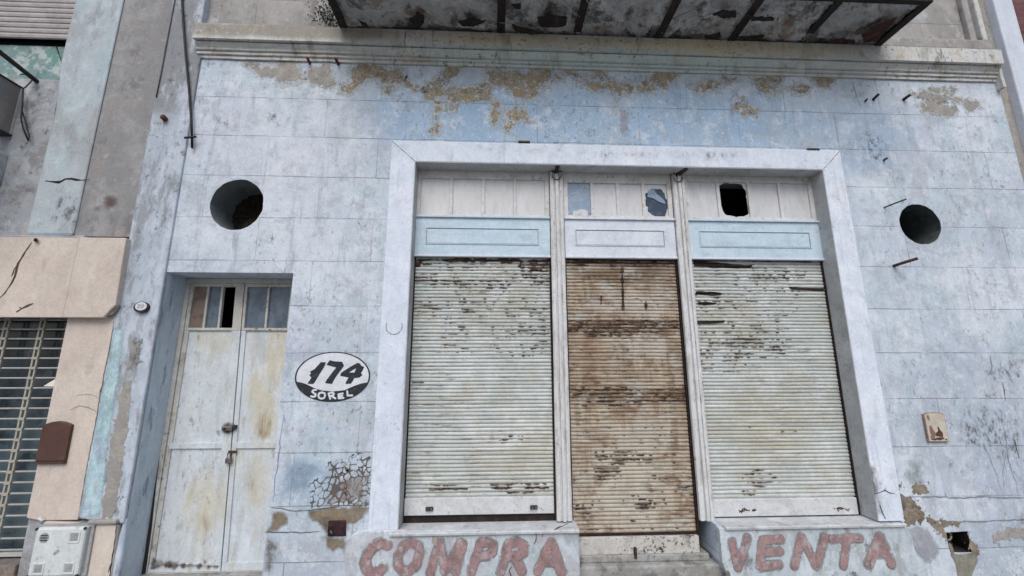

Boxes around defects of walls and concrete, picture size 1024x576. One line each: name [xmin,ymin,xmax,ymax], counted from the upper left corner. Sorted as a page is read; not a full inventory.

peeling [241,60,837,137]
peeling [908,84,984,120]
crack [45,177,81,185]
crack [0,242,33,312]
corrosion [414,258,550,356]
corrosion [566,259,682,365]
corrosion [693,260,824,372]
corrosion [572,371,686,488]
crack [265,415,372,533]
corrosion [490,483,549,496]
corrosion [622,462,693,530]
spalling [898,481,980,557]